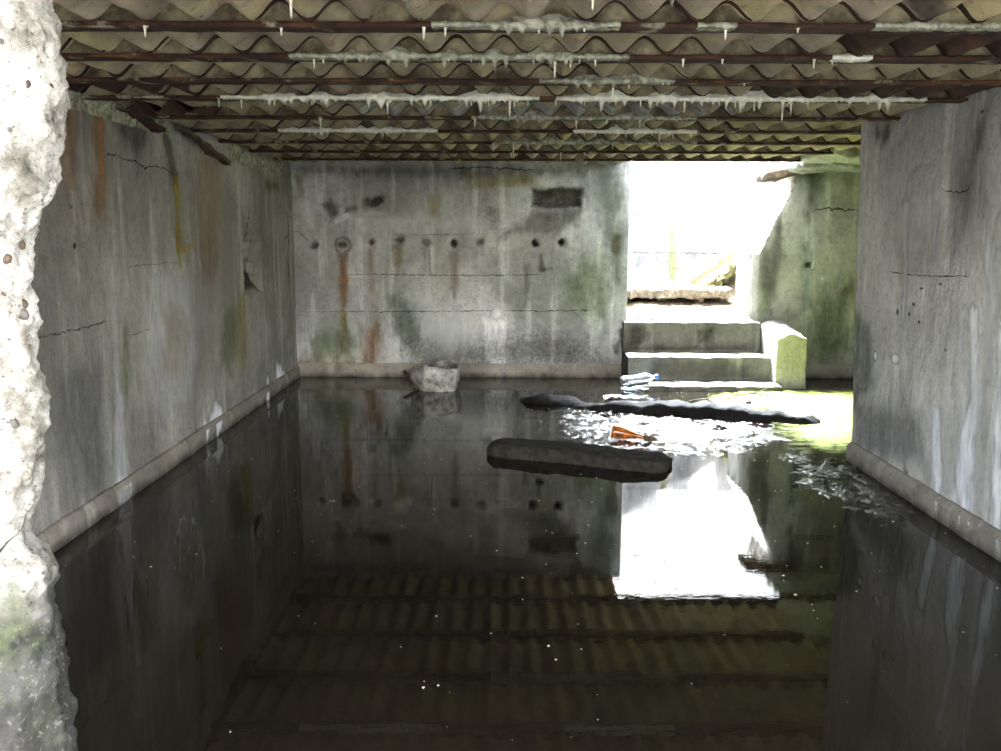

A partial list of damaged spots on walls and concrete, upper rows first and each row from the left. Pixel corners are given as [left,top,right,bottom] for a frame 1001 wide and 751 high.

damp [220,14,927,147]
corrosion [93,116,105,213]
crack [103,152,172,180]
crack [38,320,107,338]
corrosion [340,254,348,310]
crack [888,268,971,277]
damp [933,410,942,505]
damp [956,306,979,524]
damp [992,323,1001,541]